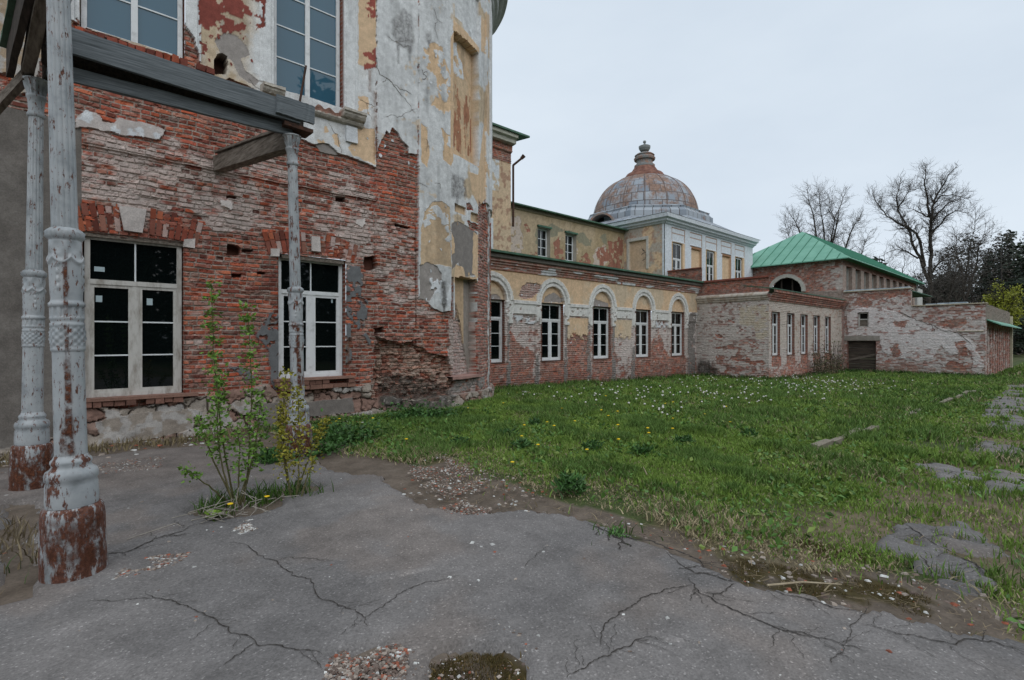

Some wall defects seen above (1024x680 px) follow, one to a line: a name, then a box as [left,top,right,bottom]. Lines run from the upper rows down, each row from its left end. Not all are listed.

peeling [71,0,267,75]
peeling [358,0,377,69]
crack [362,62,427,119]
flaking render [315,16,503,391]
spalling [370,326,459,410]
flaking render [519,282,565,303]
peeling [566,317,591,382]
peeling [850,290,910,307]
peeling [934,316,968,328]
peeling [943,340,969,371]
rust [8,325,74,491]
rust [44,518,103,569]